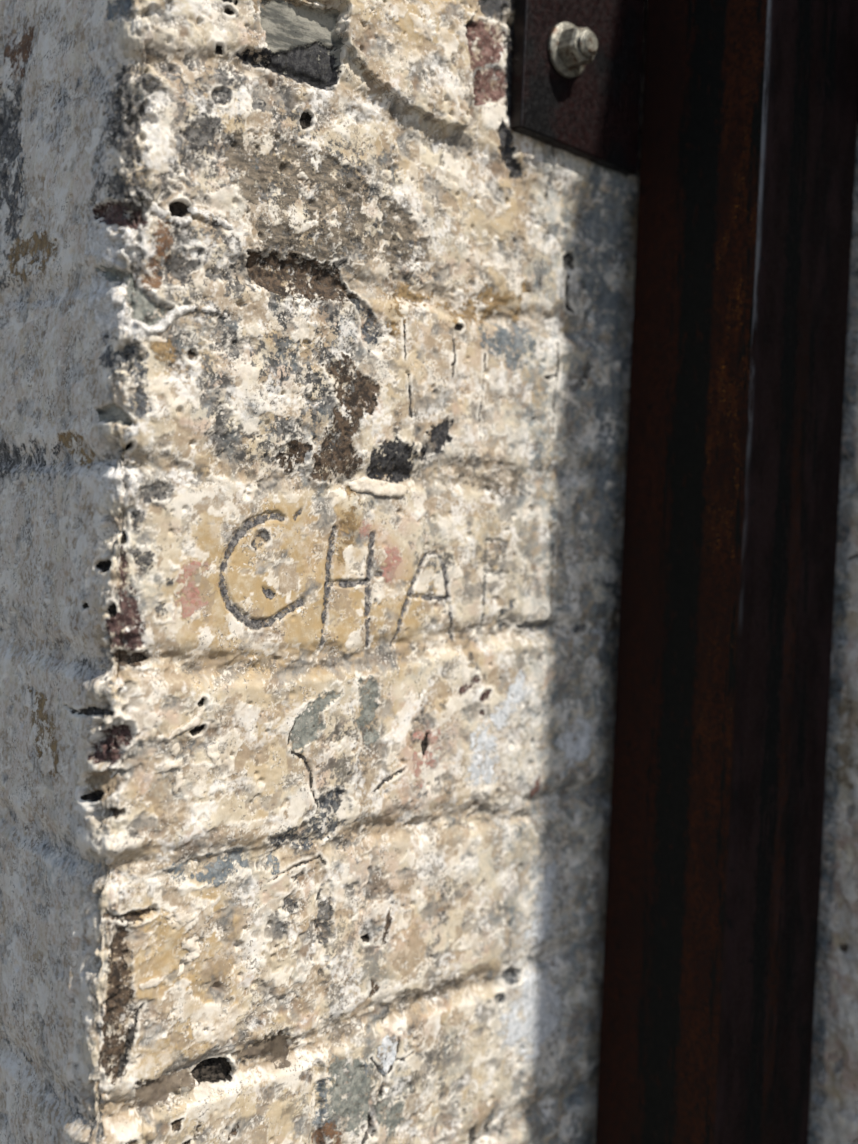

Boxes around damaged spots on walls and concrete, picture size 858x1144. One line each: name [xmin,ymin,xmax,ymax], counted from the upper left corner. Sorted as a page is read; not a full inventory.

peeling [106,0,132,21]
spalling [252,0,345,74]
flaking render [466,20,507,106]
crack [288,718,318,807]
crack [374,768,406,792]
crack [268,855,326,882]
spalling [97,907,156,1085]